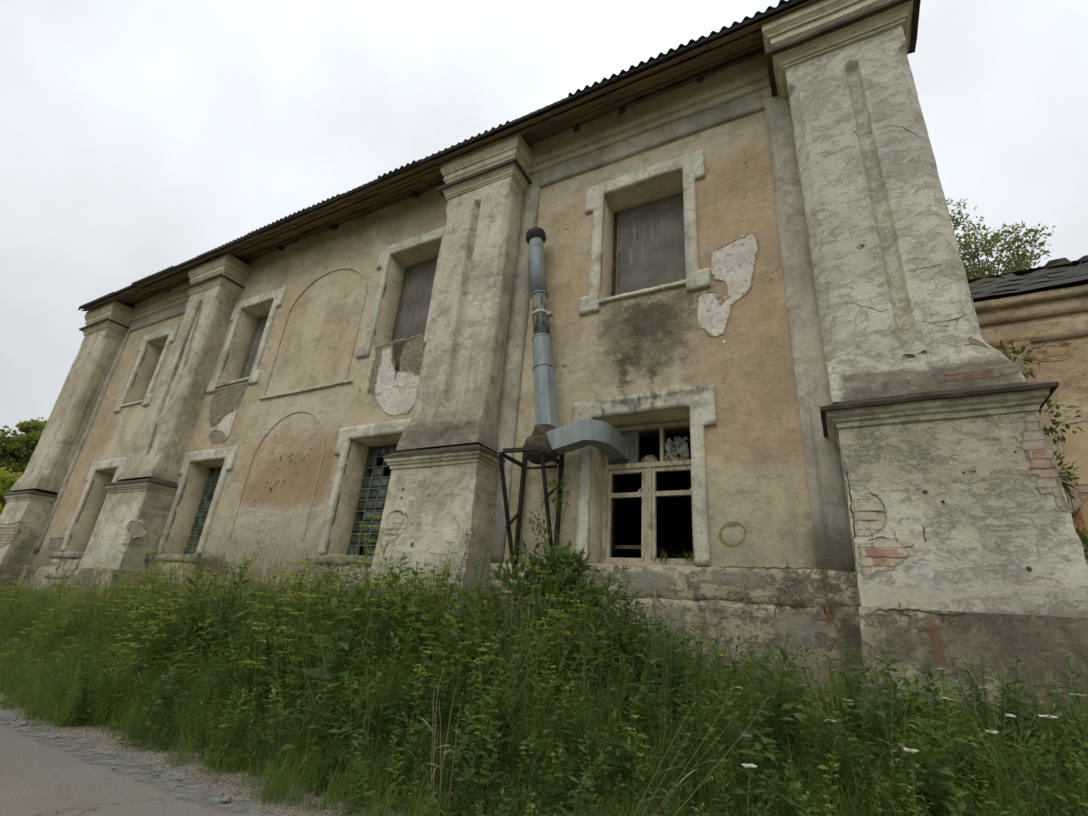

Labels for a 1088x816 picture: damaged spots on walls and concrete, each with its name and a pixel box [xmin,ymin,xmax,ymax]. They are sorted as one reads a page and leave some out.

flaking render [696,233,760,343]
flaking render [208,382,249,445]
flaking render [359,331,426,419]
flaking render [1014,413,1088,562]
flaking render [853,498,910,580]